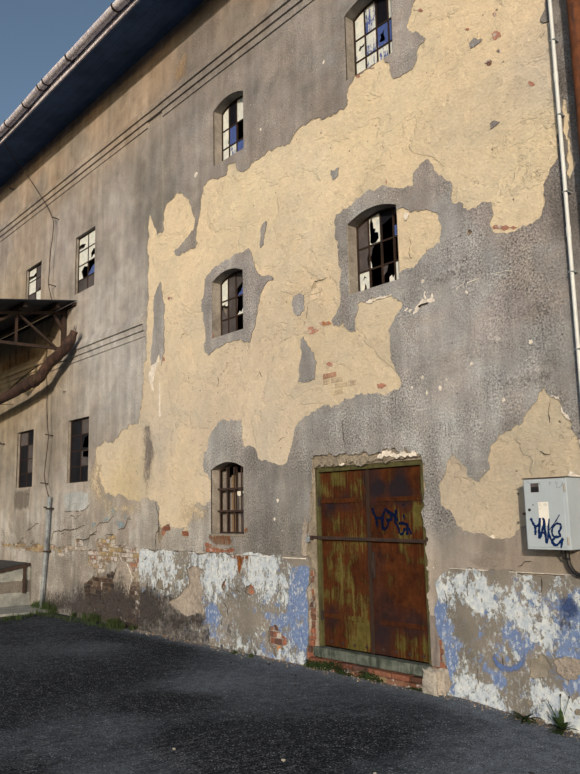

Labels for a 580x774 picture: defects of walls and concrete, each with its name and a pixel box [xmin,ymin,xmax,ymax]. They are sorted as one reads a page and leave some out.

flaking render [63,0,580,543]
crack [17,505,130,544]
flaking render [2,534,140,629]
flaking render [157,566,204,616]
flaking render [301,448,426,665]
flaking render [270,625,287,650]
flaking render [429,615,447,670]
flaking render [530,655,580,681]